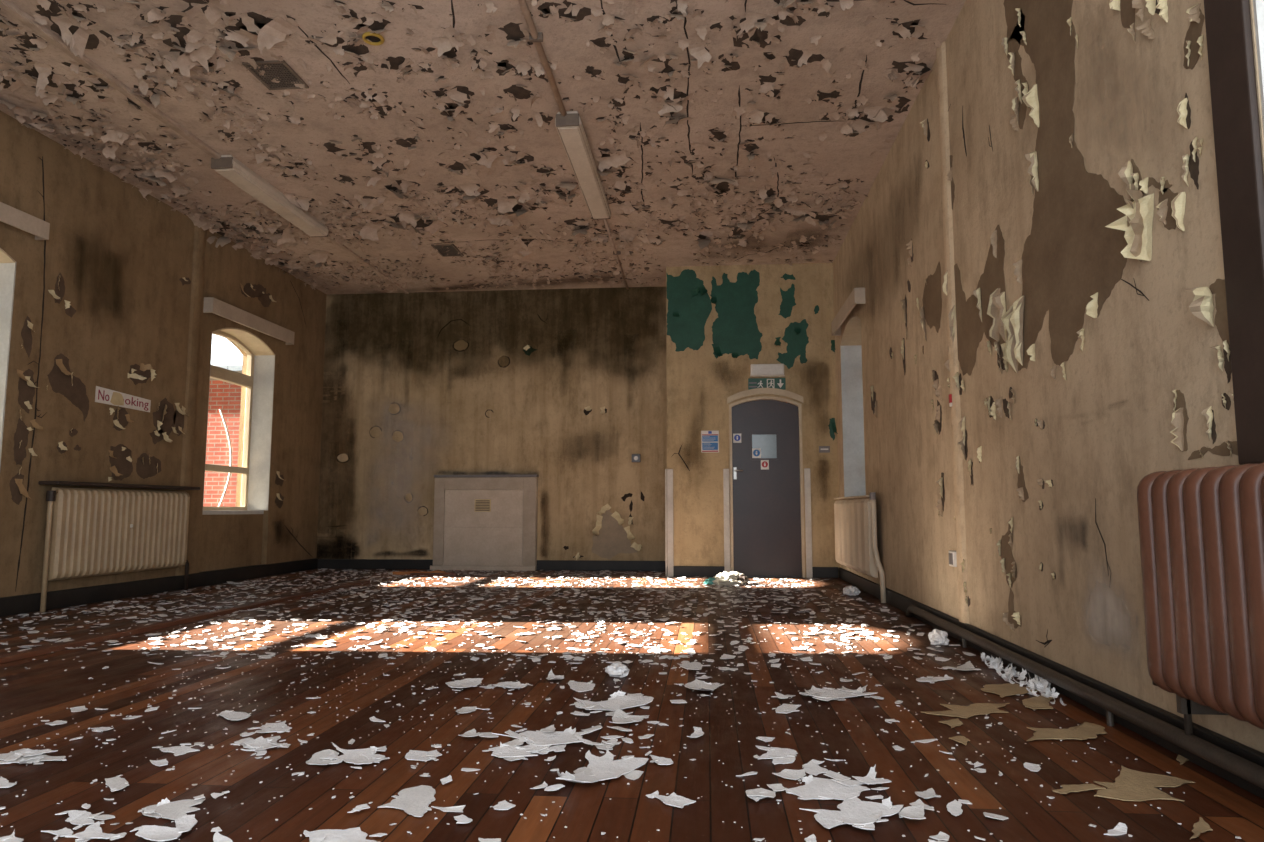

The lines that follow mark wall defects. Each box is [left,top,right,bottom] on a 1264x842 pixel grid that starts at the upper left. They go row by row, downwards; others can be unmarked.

peeling [889,0,1205,435]
peeling [1170,279,1238,460]
peeling [936,472,945,517]
peeling [958,416,982,485]
peeling [1015,456,1054,510]